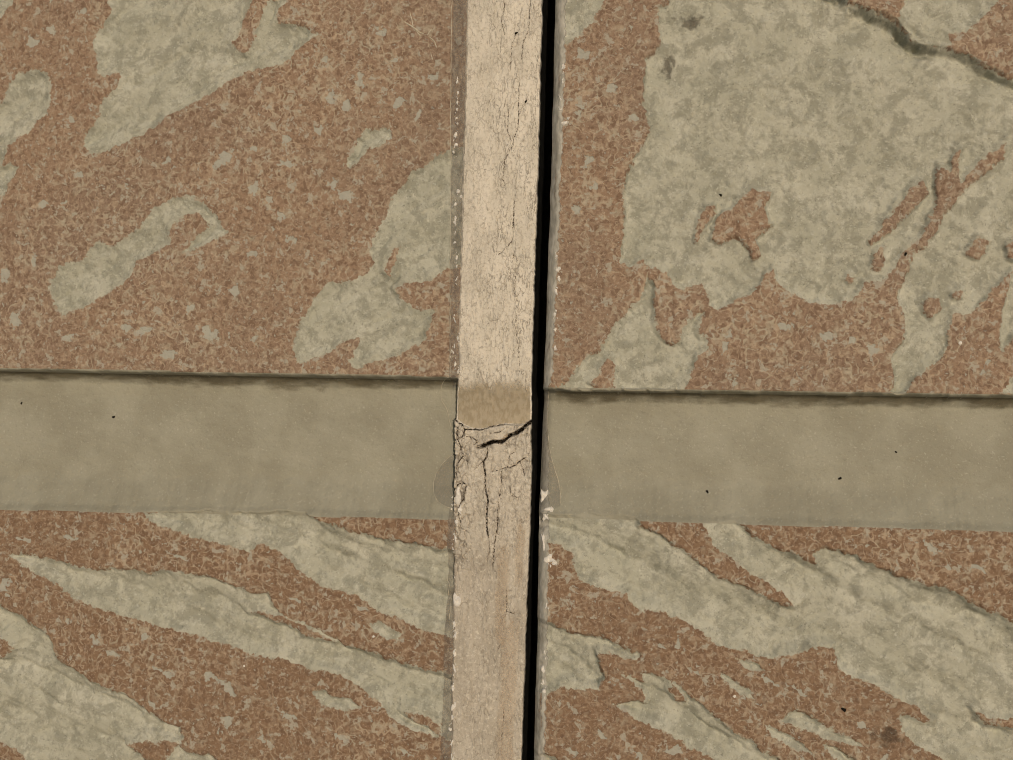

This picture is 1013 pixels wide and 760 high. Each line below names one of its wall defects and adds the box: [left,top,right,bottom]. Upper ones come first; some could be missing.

spalling [0,66,52,199]
spalling [48,194,229,316]
spalling [83,0,319,157]
spalling [292,76,464,369]
spalling [554,0,1013,395]
spalling [0,487,462,760]
crack [454,418,532,565]
spalling [535,489,1013,760]